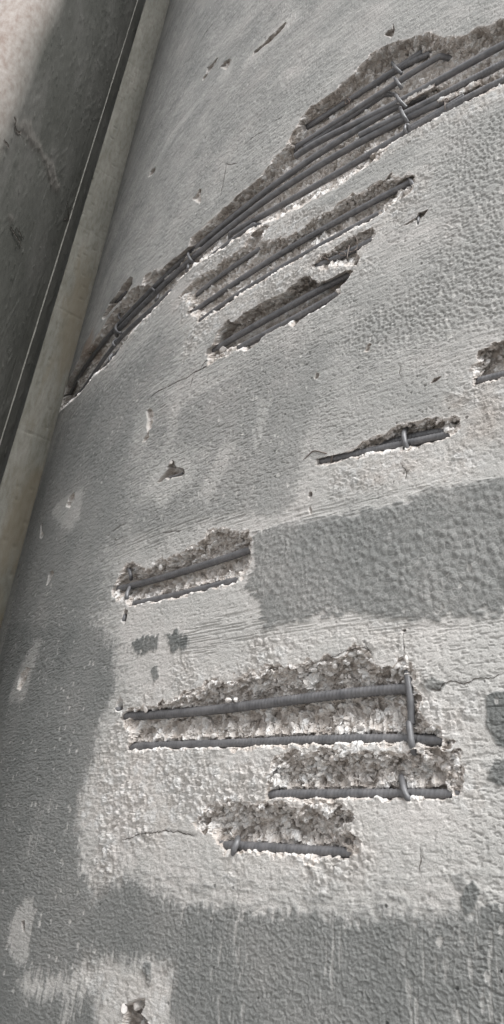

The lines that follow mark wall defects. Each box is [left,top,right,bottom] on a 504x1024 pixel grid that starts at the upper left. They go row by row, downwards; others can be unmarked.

spalling [59,7,504,412]
peeling [144,451,195,505]
peeling [297,334,504,519]
peeling [78,526,504,923]
crack [122,830,194,842]